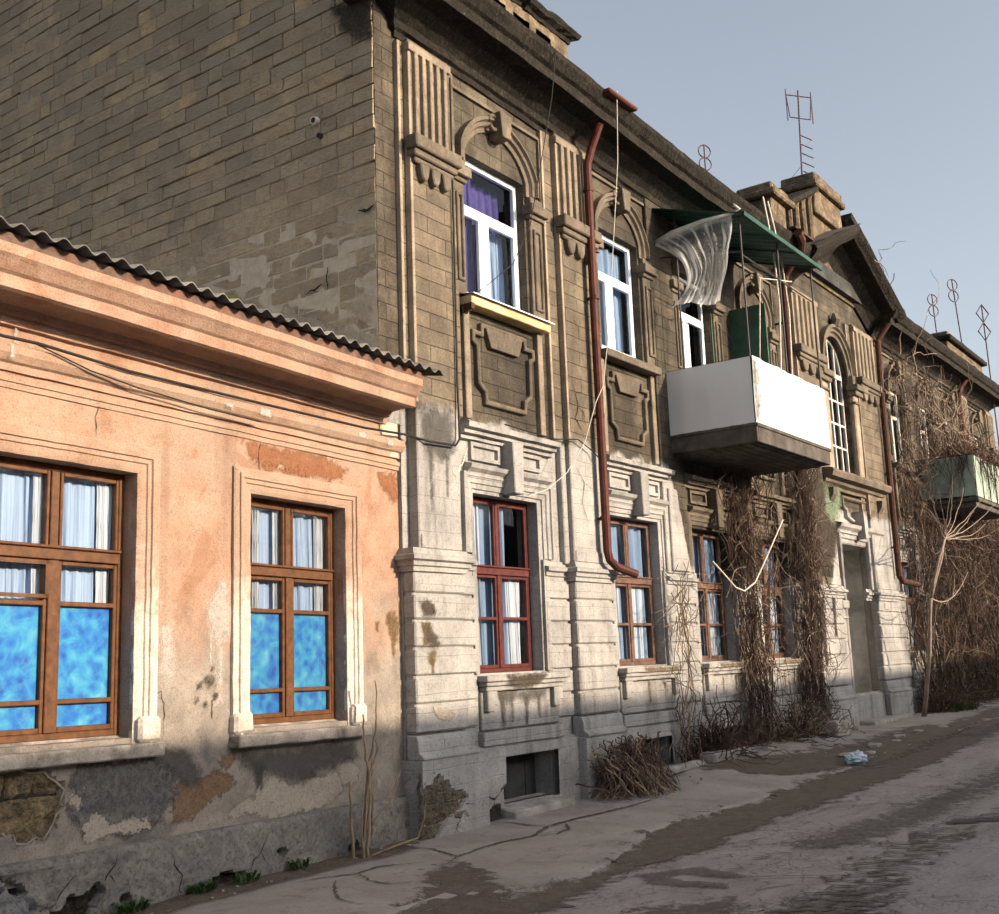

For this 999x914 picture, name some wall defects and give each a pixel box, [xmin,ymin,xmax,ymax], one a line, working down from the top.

peeling [246,441,345,482]
water stain [153,749,202,787]
flaking render [0,748,237,845]
spalling [416,772,469,840]
hole [49,885,98,914]